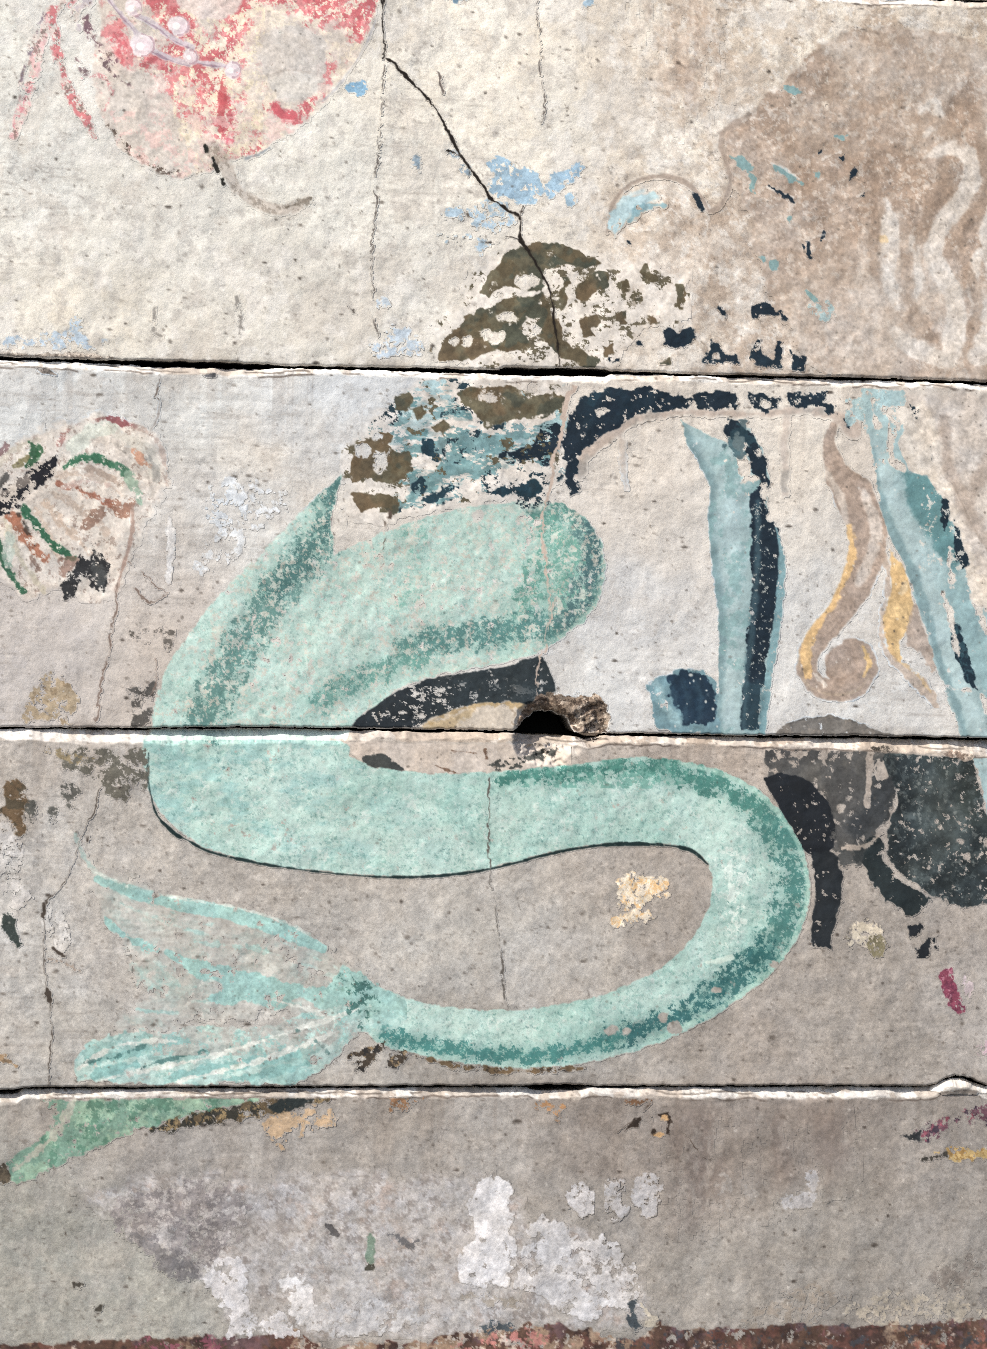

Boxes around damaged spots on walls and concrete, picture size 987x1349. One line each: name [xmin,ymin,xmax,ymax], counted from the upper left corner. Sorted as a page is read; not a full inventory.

crack [369,0,579,695]
spalling [516,691,612,740]